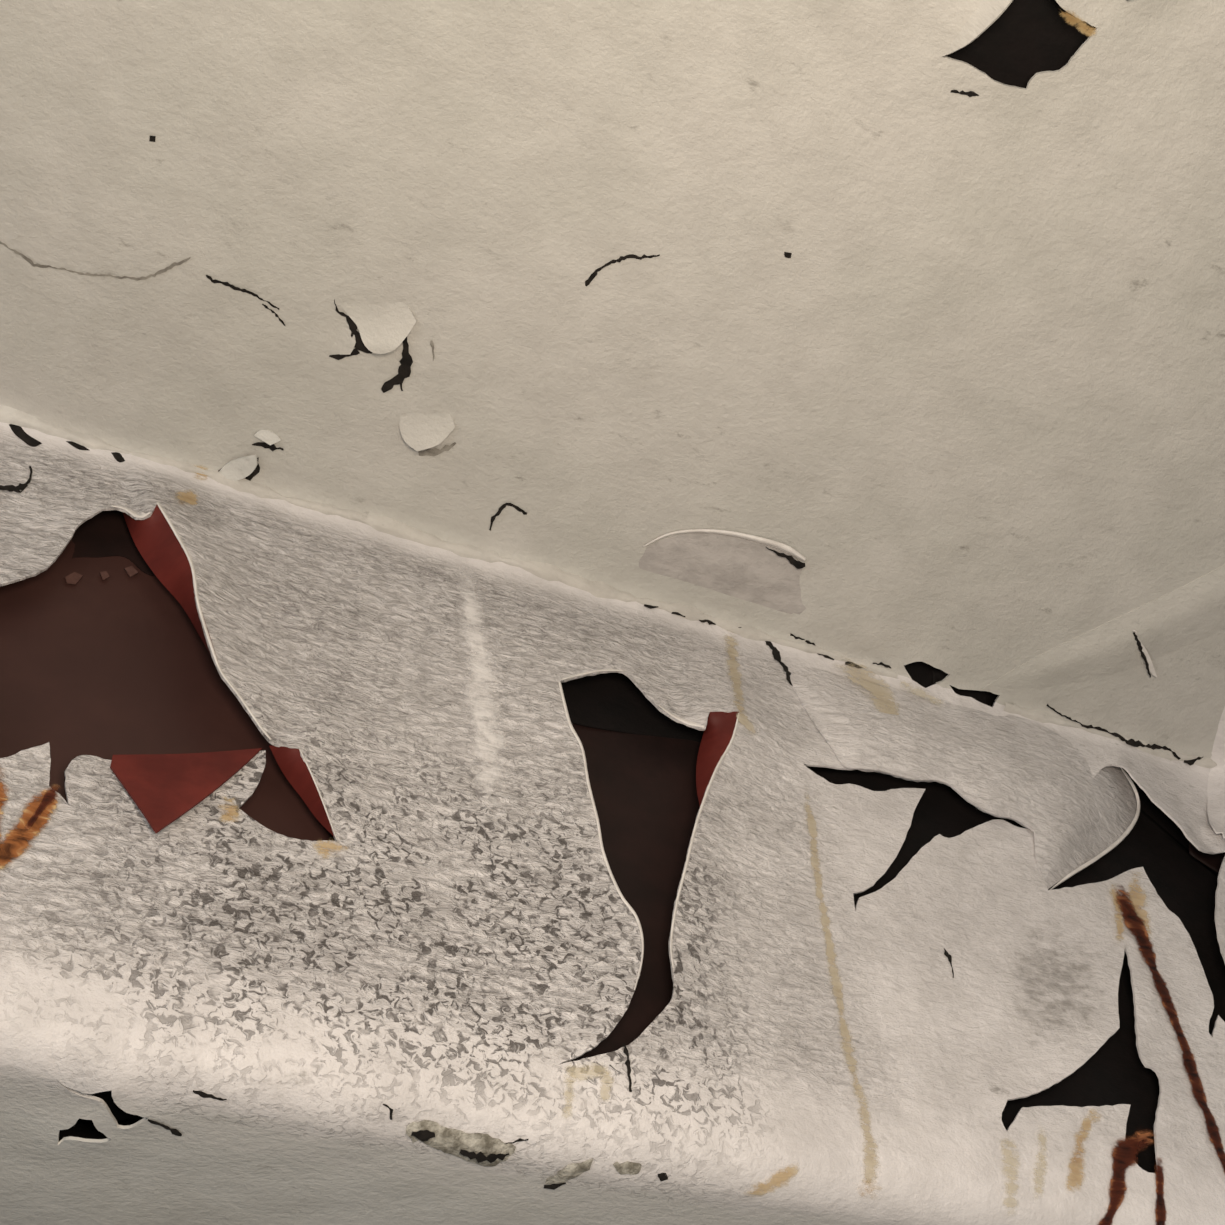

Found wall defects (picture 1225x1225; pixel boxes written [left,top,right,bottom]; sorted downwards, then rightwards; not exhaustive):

peeling [945,0,1096,88]
crack [0,241,285,326]
crack [585,254,660,286]
peeling [0,502,338,841]
crack [1046,704,1204,766]
corrosion [0,788,58,869]
peeling [558,669,740,1092]
peeling [1048,809,1225,1036]
peeling [1002,951,1160,1173]
corrosion [1112,884,1225,1173]
corrosion [1098,1132,1152,1225]
corrosion [1155,1159,1166,1225]